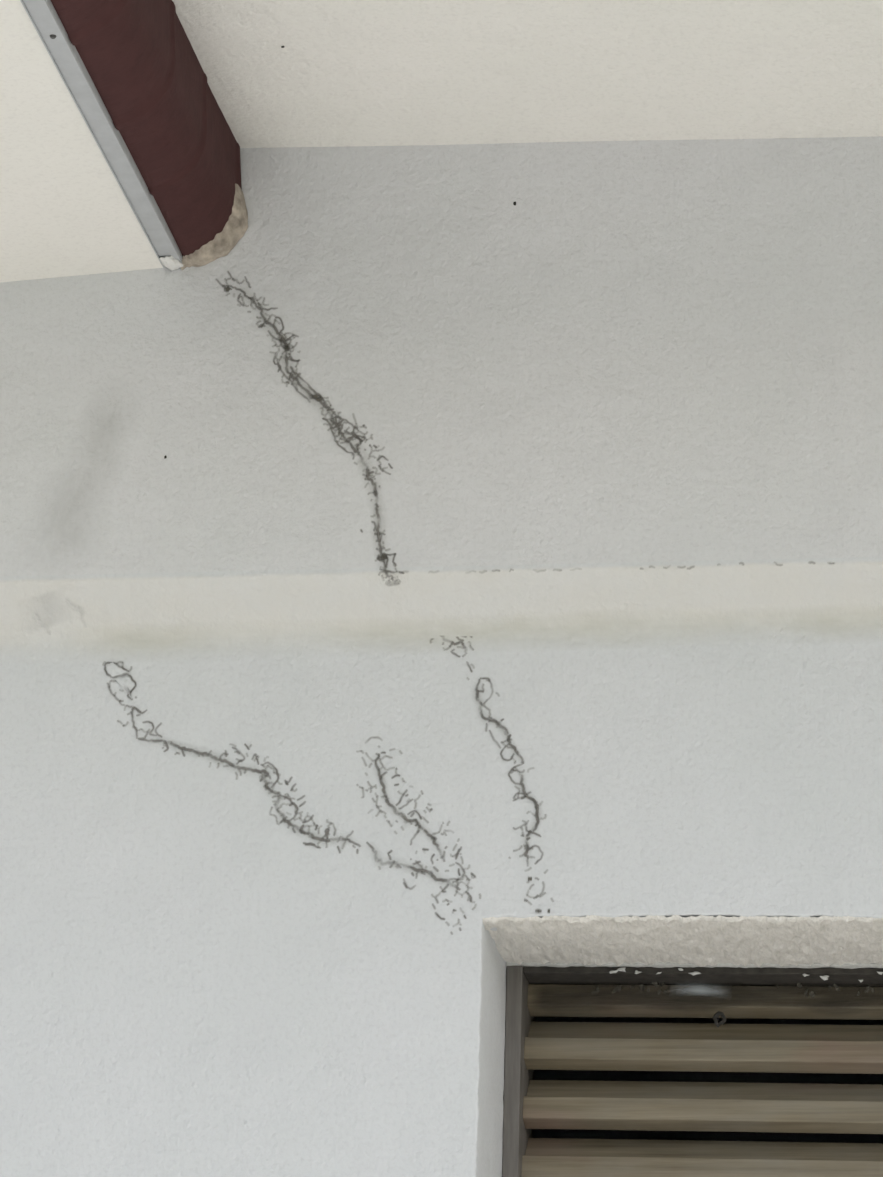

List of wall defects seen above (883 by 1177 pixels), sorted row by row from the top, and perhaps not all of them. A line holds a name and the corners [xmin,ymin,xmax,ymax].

crack [217,271,404,585]
crack [104,662,475,934]
crack [450,636,543,881]